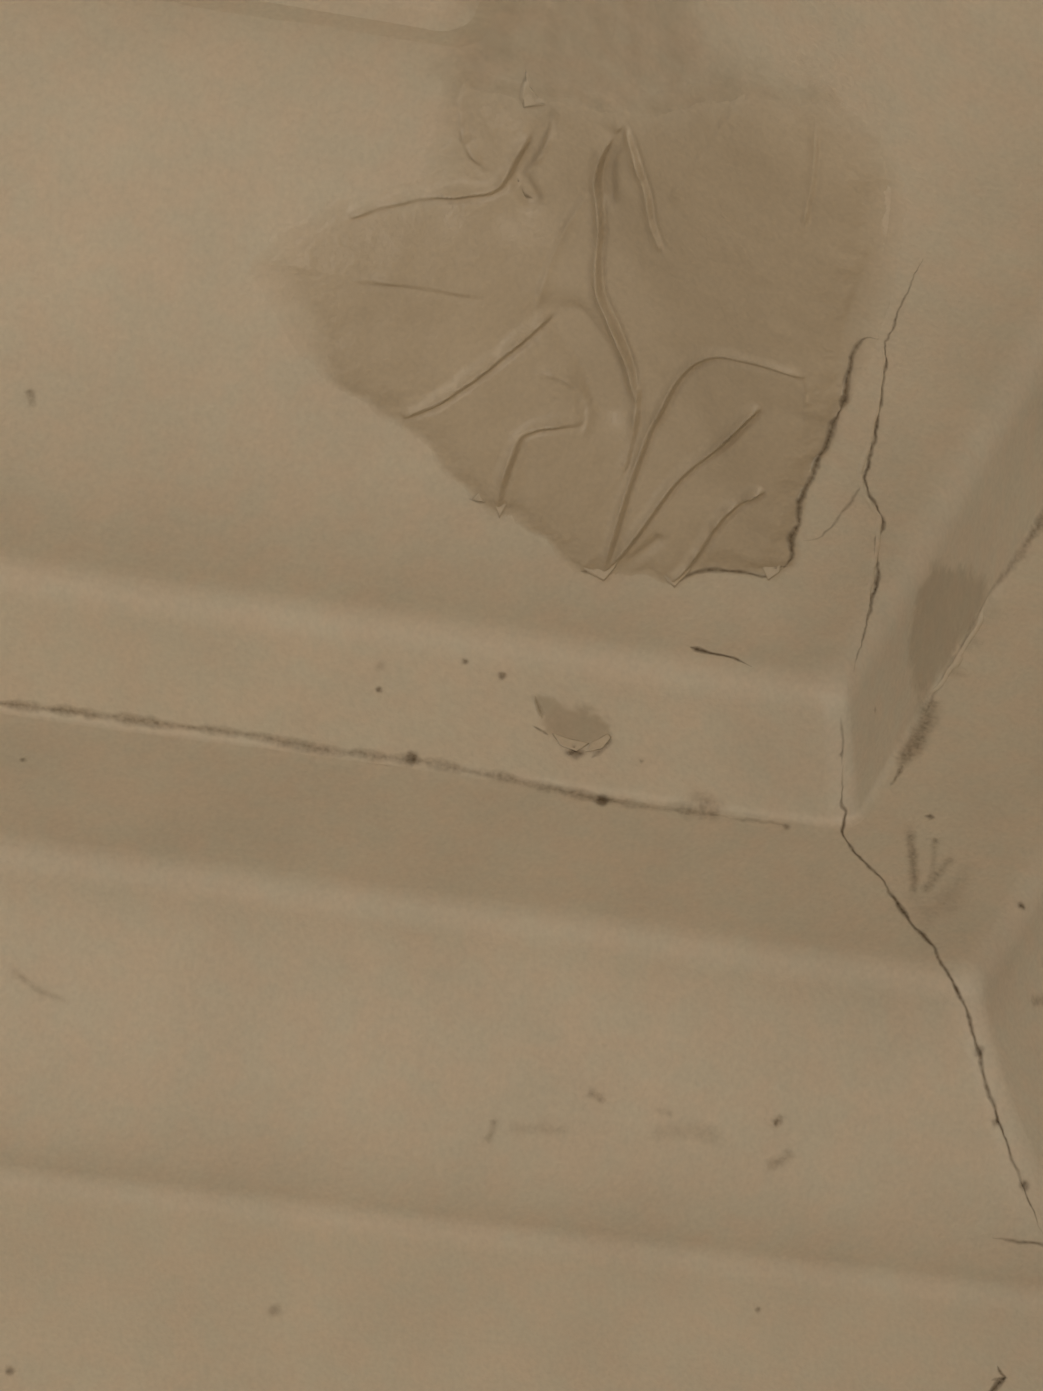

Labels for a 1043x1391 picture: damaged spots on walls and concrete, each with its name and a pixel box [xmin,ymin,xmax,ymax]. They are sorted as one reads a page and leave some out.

crack [841,816,981,1056]